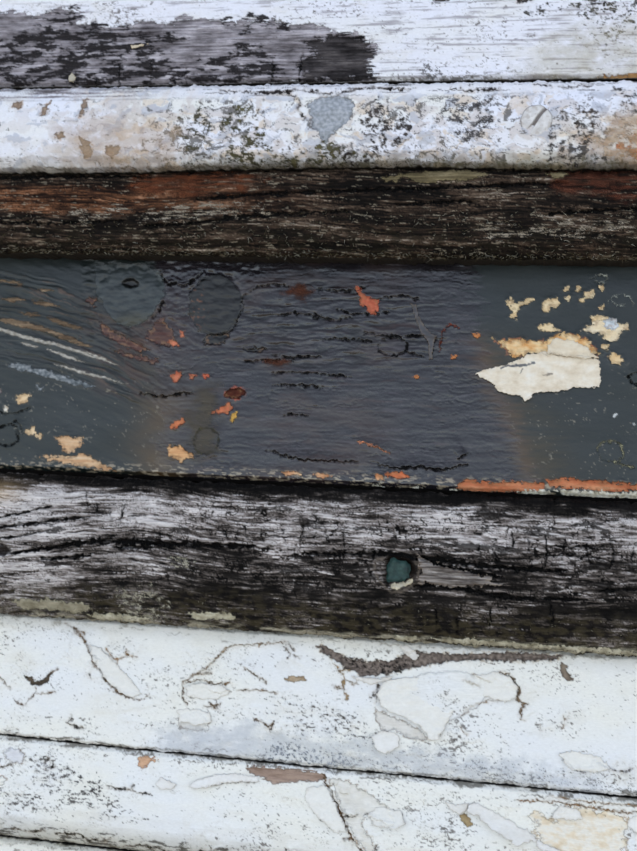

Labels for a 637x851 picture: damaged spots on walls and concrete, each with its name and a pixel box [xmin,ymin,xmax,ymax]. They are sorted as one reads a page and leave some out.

peeling [0,7,381,87]
peeling [506,285,604,318]
peeling [8,362,93,391]
peeling [476,305,629,401]
peeling [39,436,115,471]
crack [73,627,145,699]
crack [182,641,294,709]
crack [336,666,350,700]
crack [499,672,528,720]
peeling [246,765,387,851]
crack [323,774,362,851]
peeling [528,805,637,851]